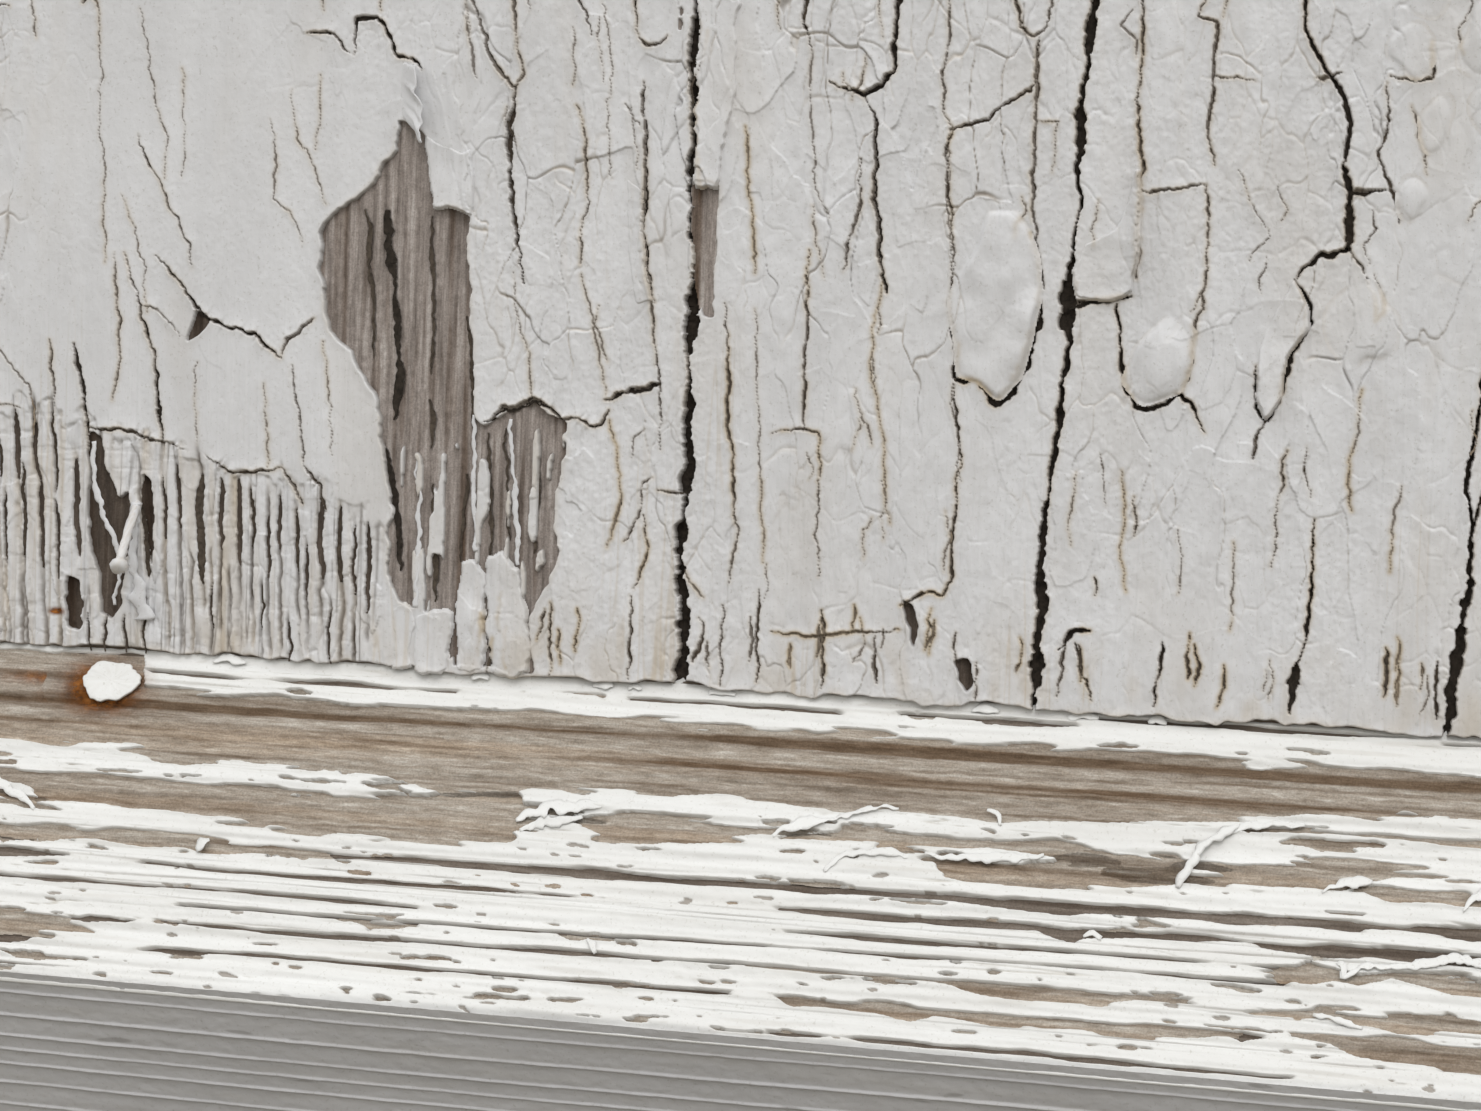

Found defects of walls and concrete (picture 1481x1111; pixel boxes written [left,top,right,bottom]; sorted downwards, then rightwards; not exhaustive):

crack [3,285,197,453]
crack [310,0,420,66]
peeling [321,63,567,693]
peeling [678,0,742,317]
crack [492,0,1210,705]
peeling [1072,169,1143,302]
peeling [1255,279,1311,420]
crack [1253,0,1436,486]
corrosion [67,666,136,710]
peeling [0,409,1481,1079]
crack [1268,526,1314,713]
crack [1383,380,1481,734]